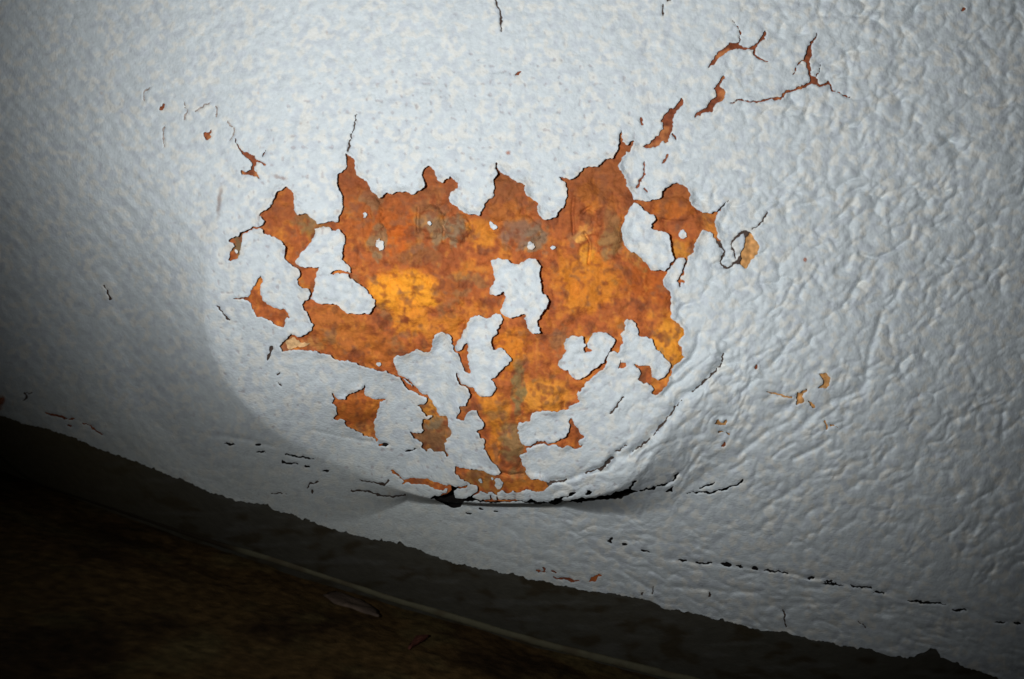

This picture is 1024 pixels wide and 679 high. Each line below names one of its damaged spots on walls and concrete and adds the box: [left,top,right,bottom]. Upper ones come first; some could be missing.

peeling [228,130,768,502]
peeling [767,373,830,408]
crack [351,353,743,515]
crack [225,442,329,494]
crack [679,559,967,612]